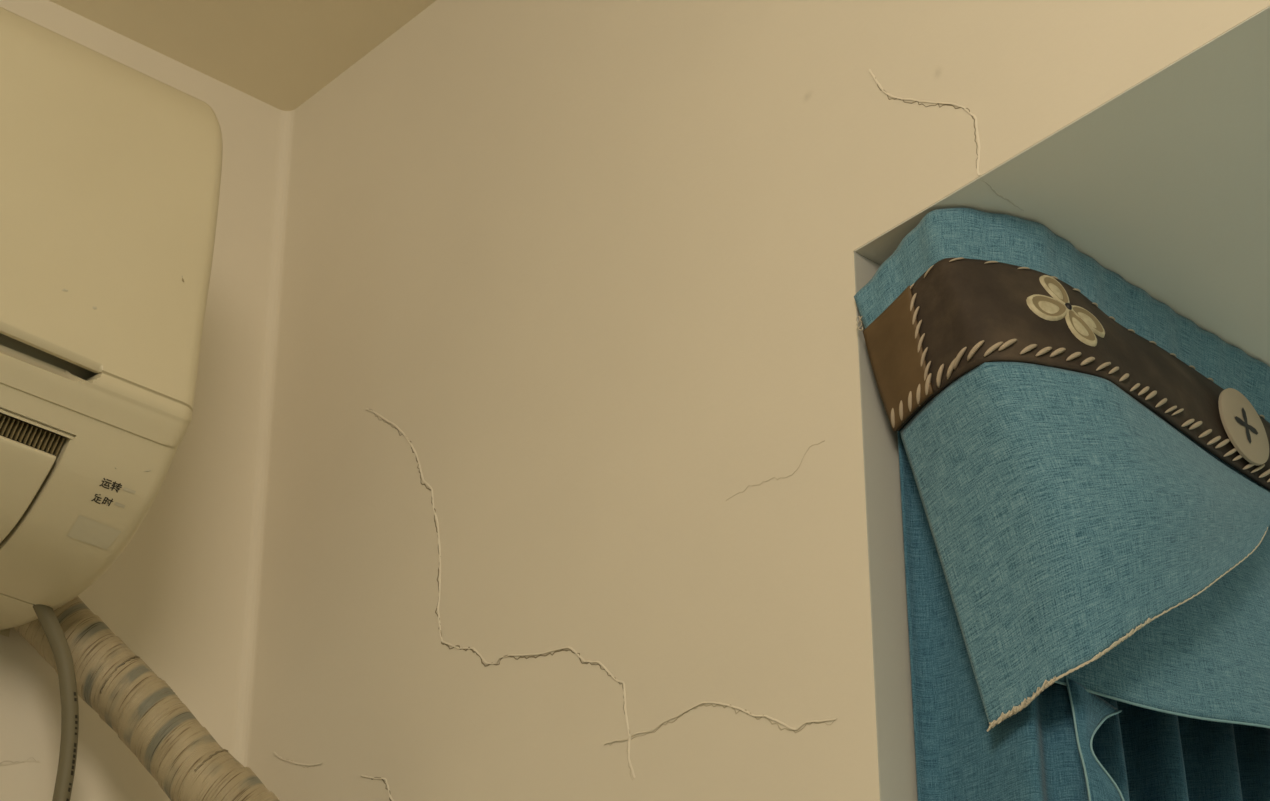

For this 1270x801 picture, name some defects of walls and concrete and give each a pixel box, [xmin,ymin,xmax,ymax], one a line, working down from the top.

crack [869,69,1024,211]
crack [365,408,837,780]